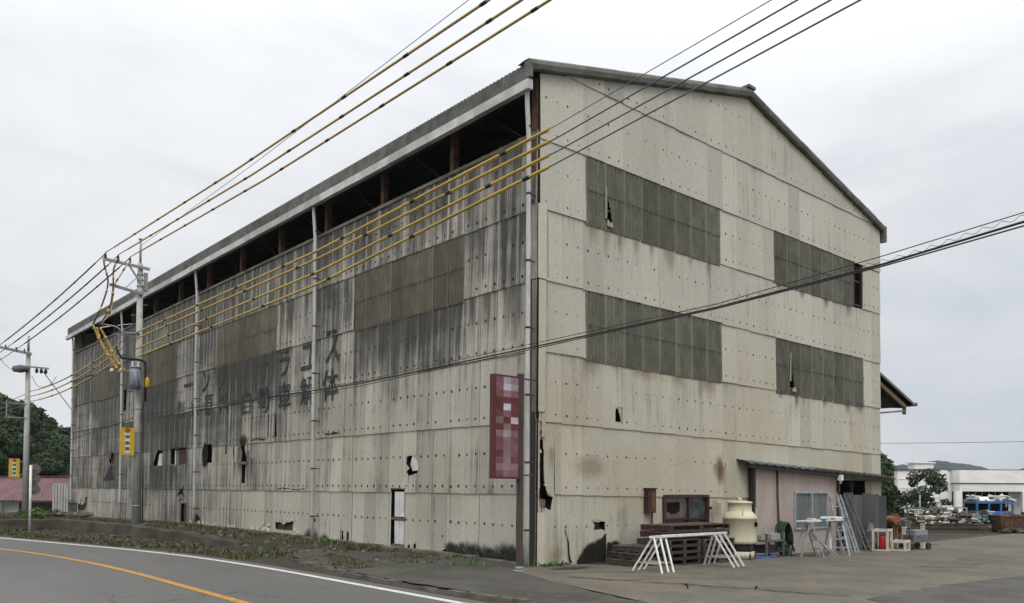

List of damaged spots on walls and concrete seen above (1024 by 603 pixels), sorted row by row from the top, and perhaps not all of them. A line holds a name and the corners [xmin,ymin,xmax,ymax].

spalling [538,436,554,511]
spalling [251,518,300,533]